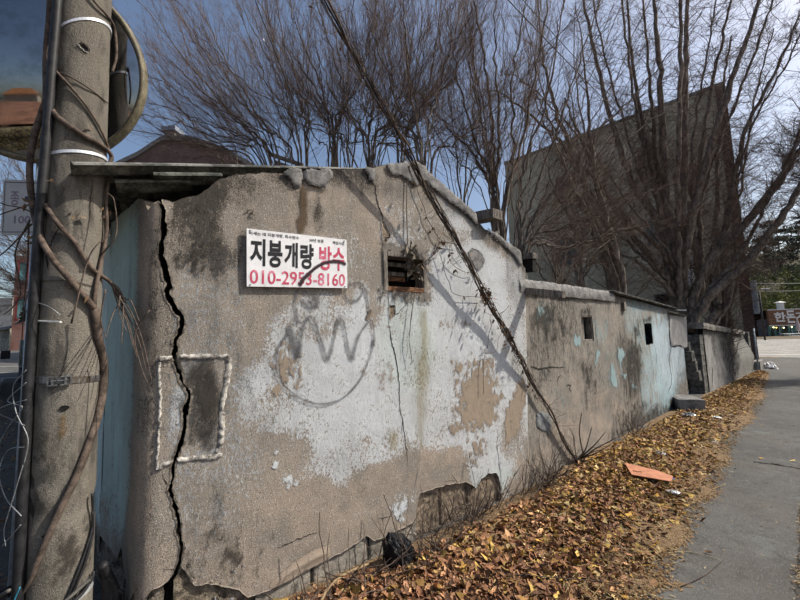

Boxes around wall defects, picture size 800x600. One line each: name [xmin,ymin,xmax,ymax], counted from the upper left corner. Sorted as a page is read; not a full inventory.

crack [155,221,193,600]
water stain [175,358,218,451]
peeling [264,341,310,402]
crack [379,297,408,463]
peeling [447,351,529,469]
peeling [272,448,301,489]
spalling [390,473,499,541]
spalling [95,539,135,600]
spalling [147,536,385,600]